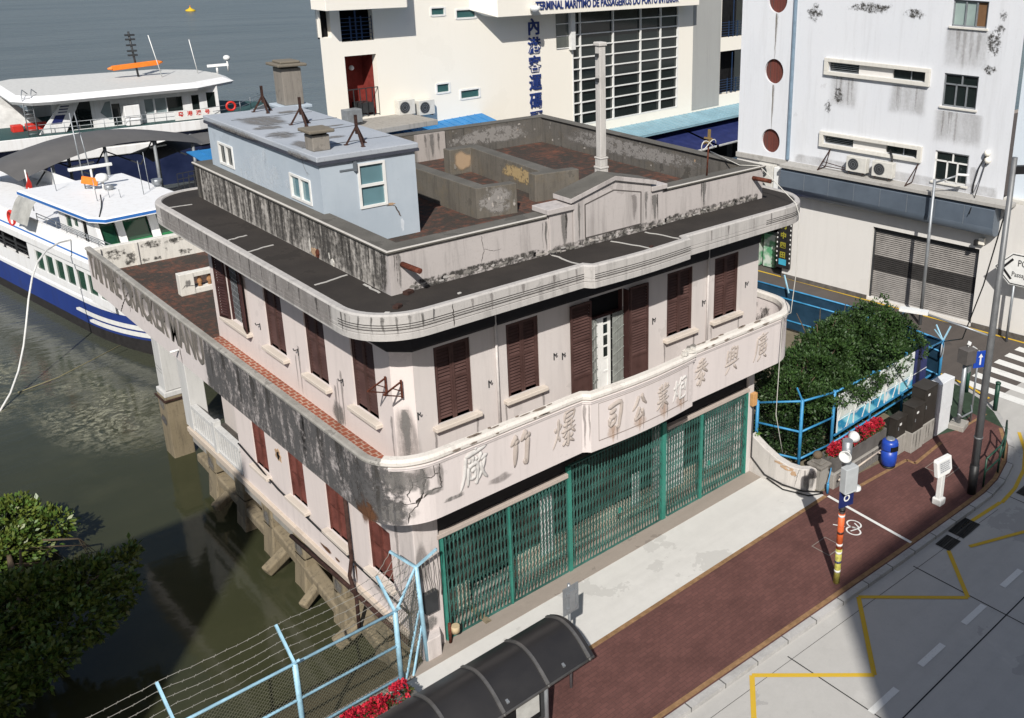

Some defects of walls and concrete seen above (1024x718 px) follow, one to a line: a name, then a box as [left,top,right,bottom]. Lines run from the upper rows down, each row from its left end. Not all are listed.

mould [853,3,889,13]
mould [984,13,1007,75]
peeling [449,123,536,170]
peeling [479,165,529,213]
water stain [196,167,401,292]
water stain [561,204,580,242]
water stain [148,298,418,526]
crack [403,463,443,523]